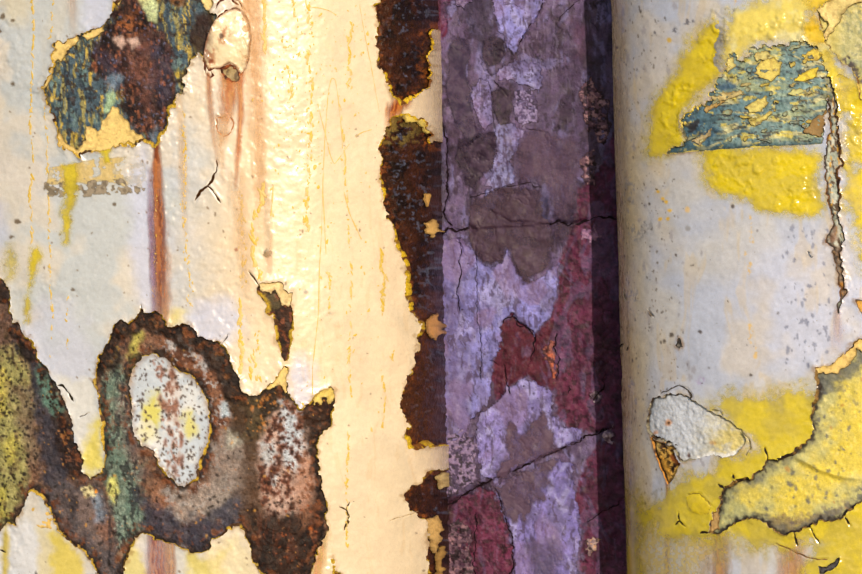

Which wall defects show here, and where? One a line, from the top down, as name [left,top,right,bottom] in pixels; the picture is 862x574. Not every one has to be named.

peeling [41,0,217,159]
rust [222,0,259,159]
rust [389,100,407,119]
peeling [667,0,862,154]
crack [442,122,510,393]
peeling [373,0,602,574]
crack [550,216,617,227]
peeling [0,278,335,574]
crack [448,428,609,574]
peeling [646,393,746,484]
peeling [709,339,862,535]